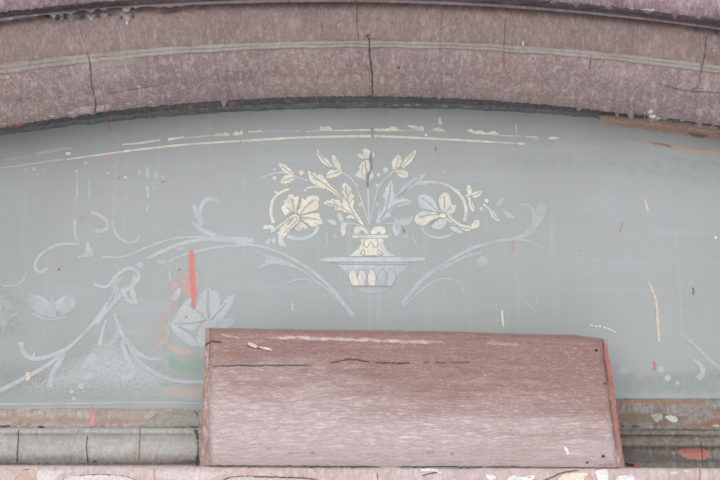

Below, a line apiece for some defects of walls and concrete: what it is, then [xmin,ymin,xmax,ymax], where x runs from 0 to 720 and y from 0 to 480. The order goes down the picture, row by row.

crack [76,24,160,112]
crack [356,1,373,96]
crack [661,38,720,94]
spalling [600,106,720,128]
crack [213,361,312,369]
crack [330,357,469,365]
peeling [544,338,634,480]
crack [13,429,21,464]
peeling [673,447,711,461]